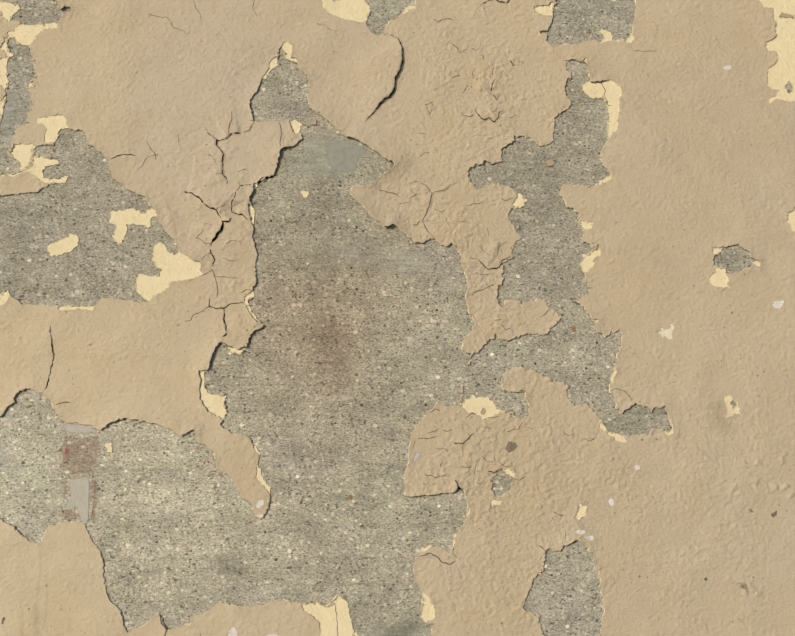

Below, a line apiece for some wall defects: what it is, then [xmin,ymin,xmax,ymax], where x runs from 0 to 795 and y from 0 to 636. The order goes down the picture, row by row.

peeling [321,0,416,36]
crack [365,35,404,122]
peeling [534,0,637,46]
peeling [759,0,795,104]
crack [185,111,273,347]
peeling [709,243,761,288]
peeling [787,207,795,232]
crack [45,325,70,405]
peeling [0,41,674,636]